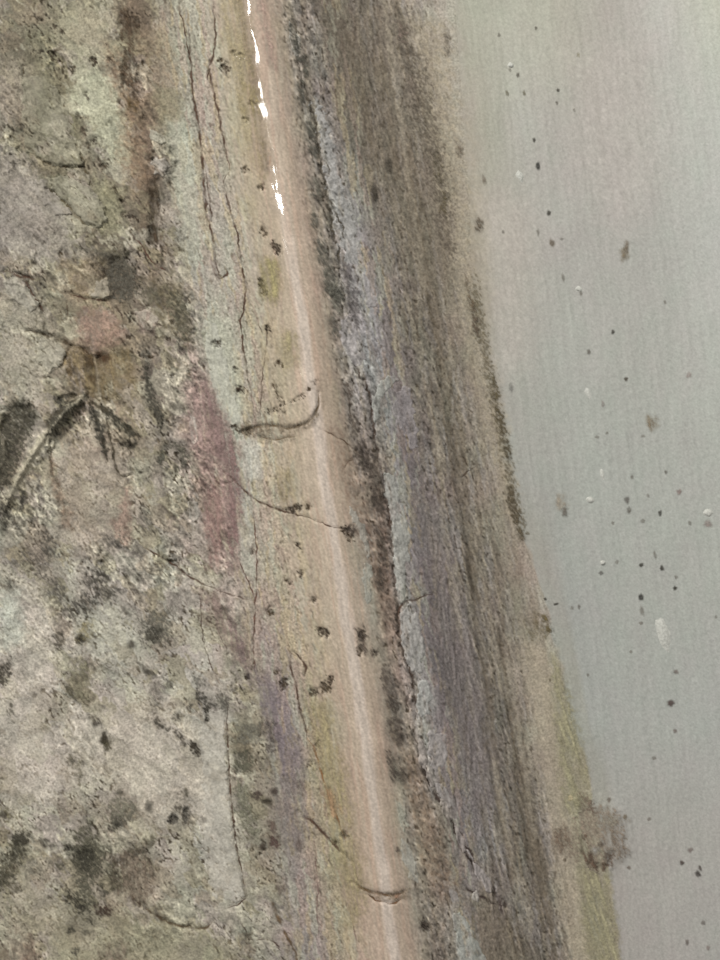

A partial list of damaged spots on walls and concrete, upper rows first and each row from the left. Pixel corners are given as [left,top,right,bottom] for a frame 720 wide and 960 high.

crack [179,13,349,445]
crack [149,550,212,668]
crack [208,462,331,635]